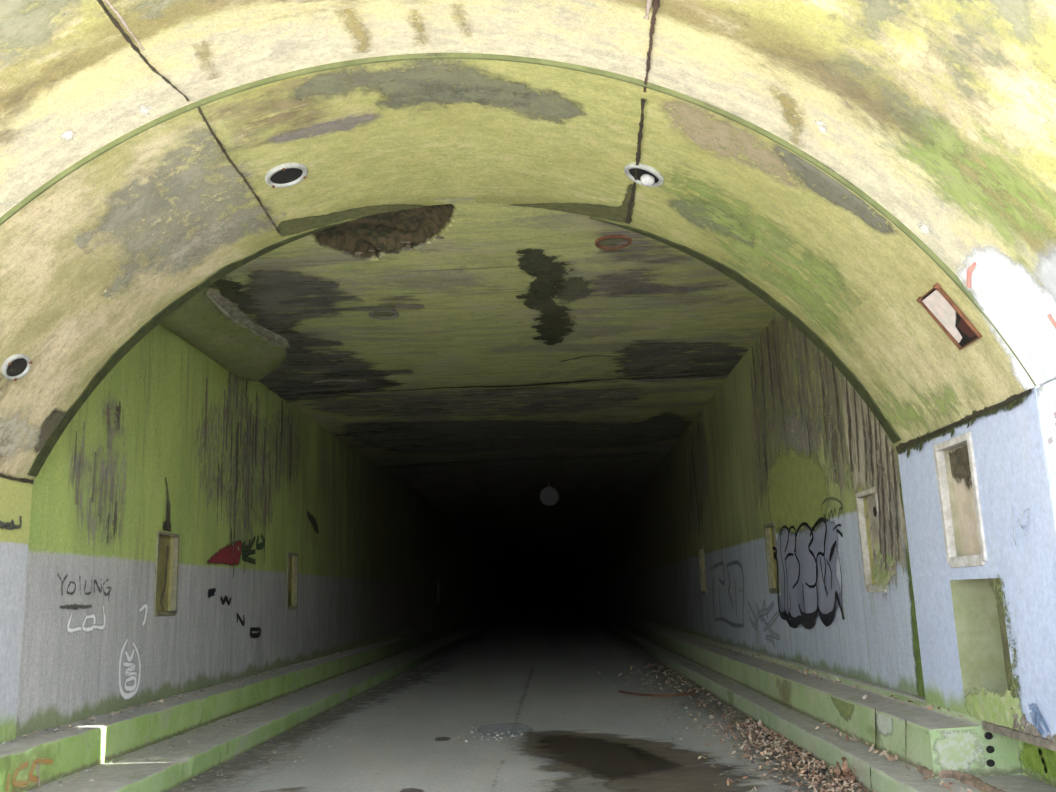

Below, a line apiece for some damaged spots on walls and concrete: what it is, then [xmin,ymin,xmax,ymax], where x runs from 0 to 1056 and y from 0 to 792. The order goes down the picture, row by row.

crack [97,0,281,233]
water stain [218,54,586,143]
crack [625,0,660,224]
water stain [74,130,428,298]
water stain [512,184,727,345]
water stain [207,270,749,453]